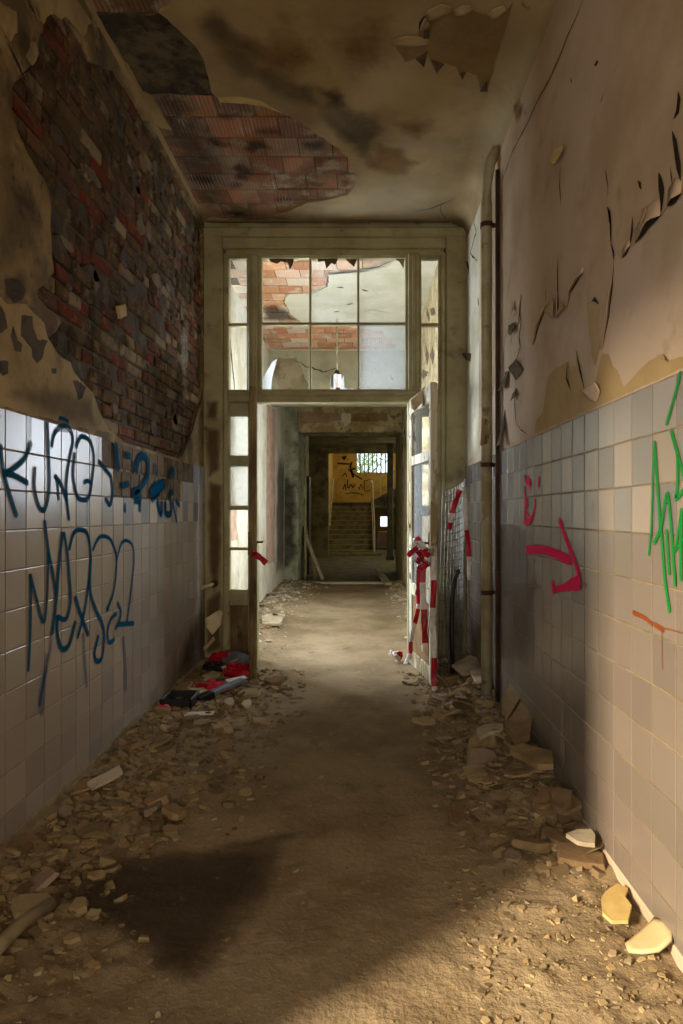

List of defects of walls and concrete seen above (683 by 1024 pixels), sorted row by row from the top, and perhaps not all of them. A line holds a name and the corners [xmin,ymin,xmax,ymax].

spalling [0,0,356,580]
spalling [263,261,399,389]
peeling [393,0,530,92]
peeling [462,0,683,463]